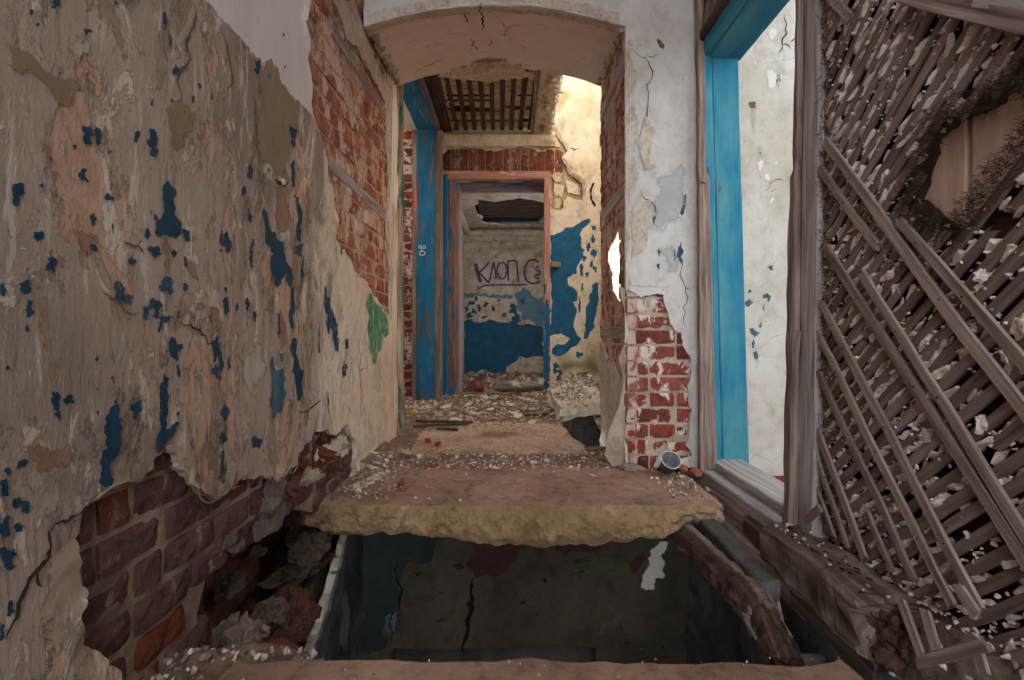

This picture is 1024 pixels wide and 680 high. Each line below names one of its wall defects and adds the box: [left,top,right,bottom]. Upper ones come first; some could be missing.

crack [464,3,526,50]
crack [632,49,659,118]
peeling [134,129,159,157]
peeling [12,182,25,206]
peeling [241,58,311,419]
flaking render [306,0,700,484]
crack [680,264,690,326]
spalling [73,180,766,680]
peeling [0,444,71,570]
crack [5,510,83,639]
crack [461,578,475,652]
spalling [780,597,847,663]